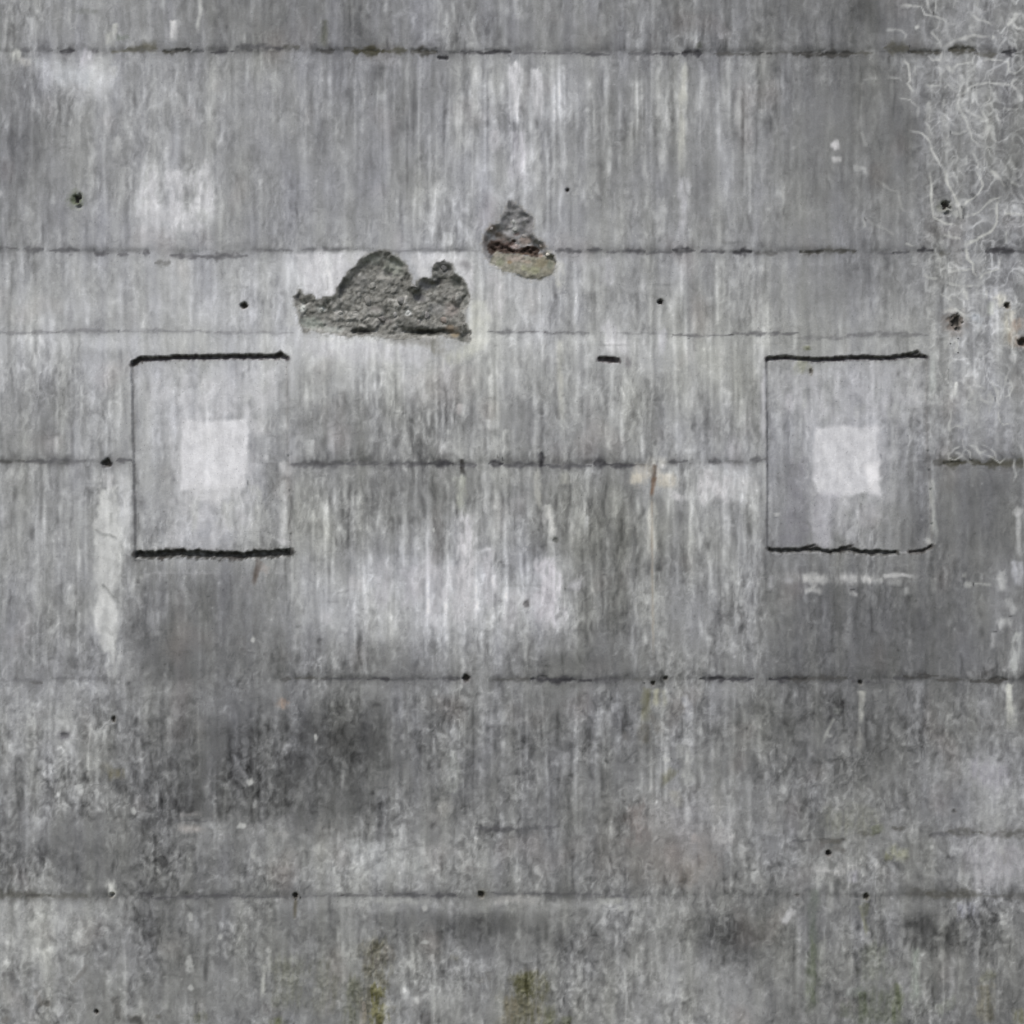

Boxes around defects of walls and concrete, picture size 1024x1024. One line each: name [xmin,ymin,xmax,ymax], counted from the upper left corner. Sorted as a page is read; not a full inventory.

spalling [477,197,556,284]
efflorescence [846,0,1024,484]
spalling [288,243,475,344]